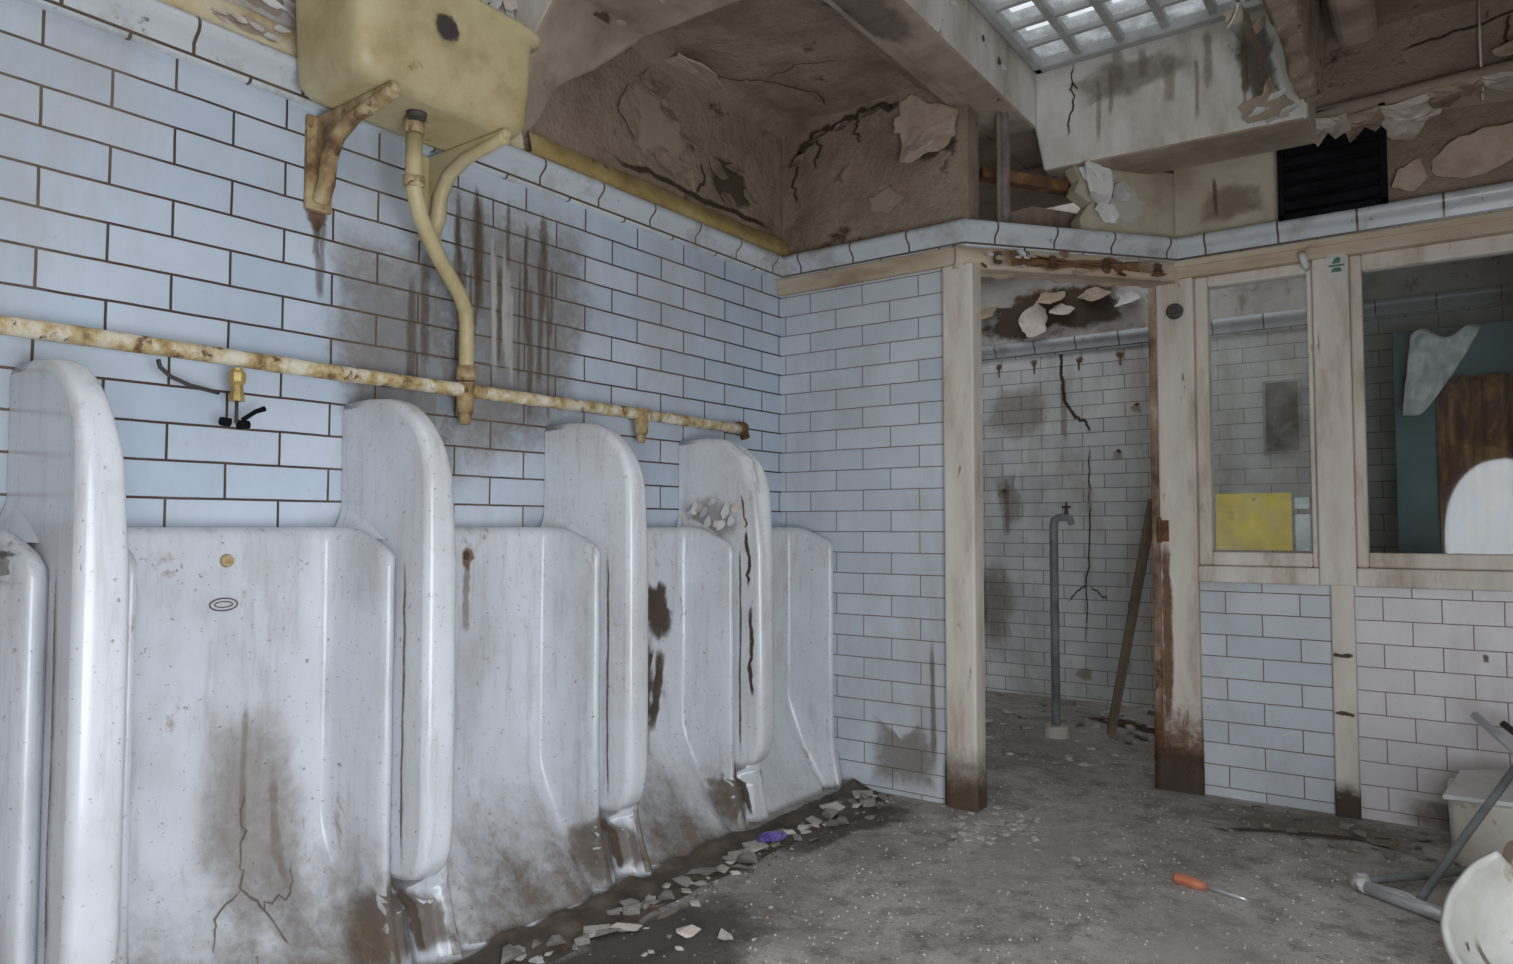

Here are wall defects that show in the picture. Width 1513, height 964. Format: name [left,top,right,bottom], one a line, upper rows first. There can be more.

flaking render [211,0,296,42]
spalling [1222,0,1300,124]
peeling [1311,41,1513,146]
crack [717,60,898,202]
flaking render [893,94,959,163]
flaking render [1391,123,1513,192]
rust [980,250,1166,282]
flaking render [981,285,1140,340]
water stain [1154,550,1205,796]
water stain [945,766,987,812]